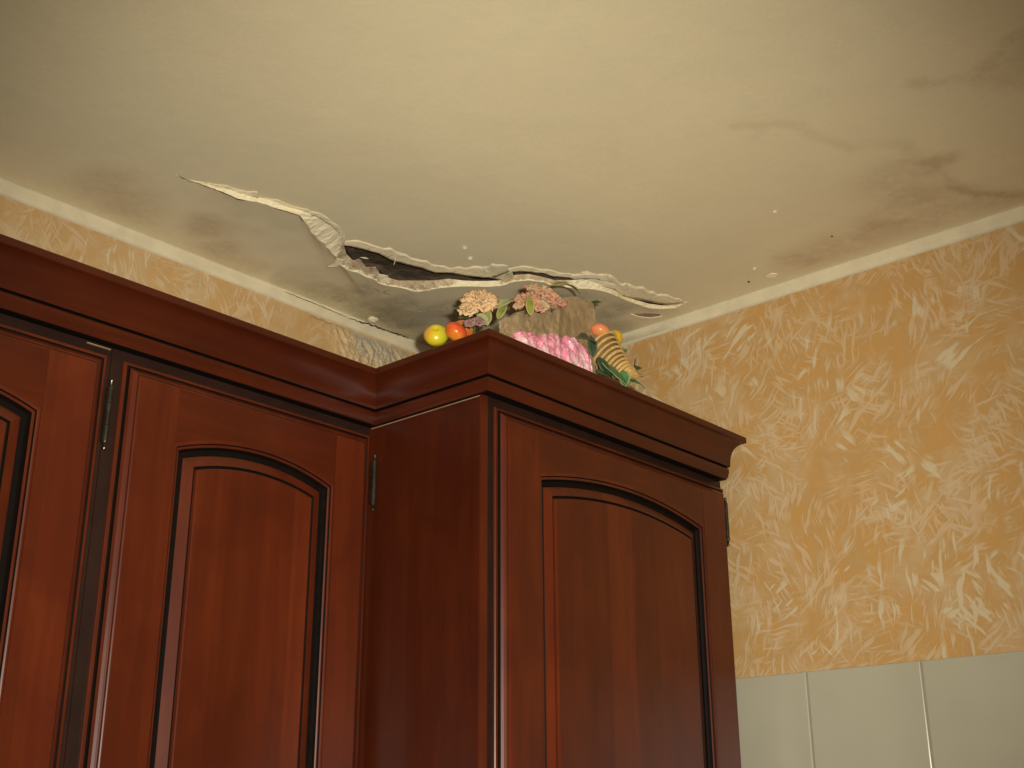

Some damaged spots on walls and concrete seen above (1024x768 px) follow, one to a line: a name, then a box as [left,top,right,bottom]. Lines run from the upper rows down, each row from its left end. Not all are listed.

spalling [207,183,684,319]